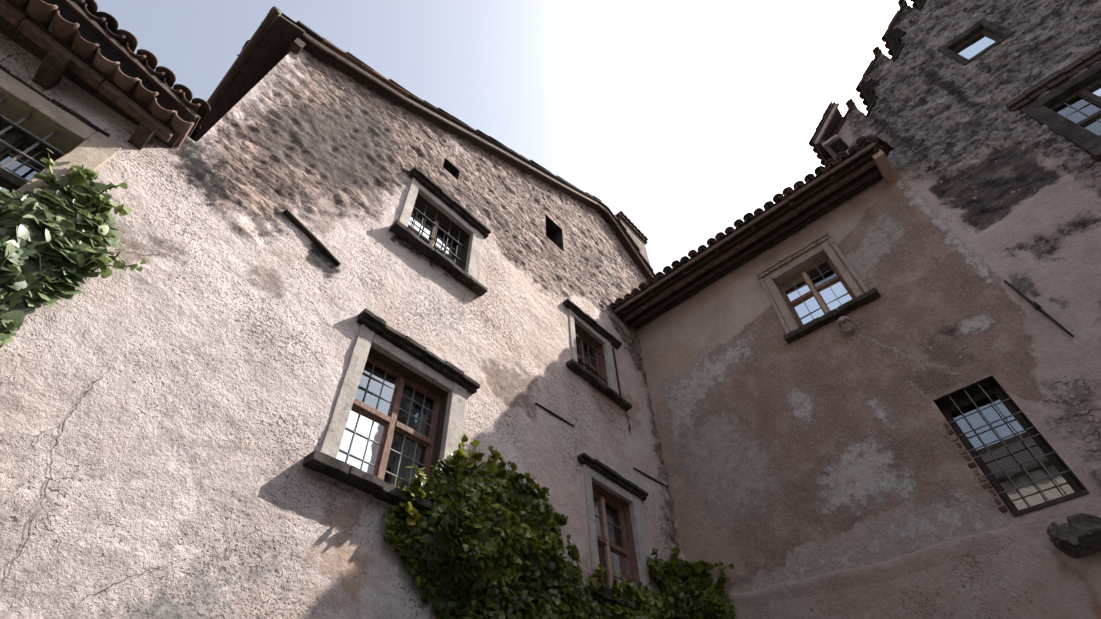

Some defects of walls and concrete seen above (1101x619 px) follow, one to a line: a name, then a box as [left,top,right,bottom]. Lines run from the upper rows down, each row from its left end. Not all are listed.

crack [0,356,117,591]
flaking render [1042,379,1101,484]
crack [80,564,172,603]